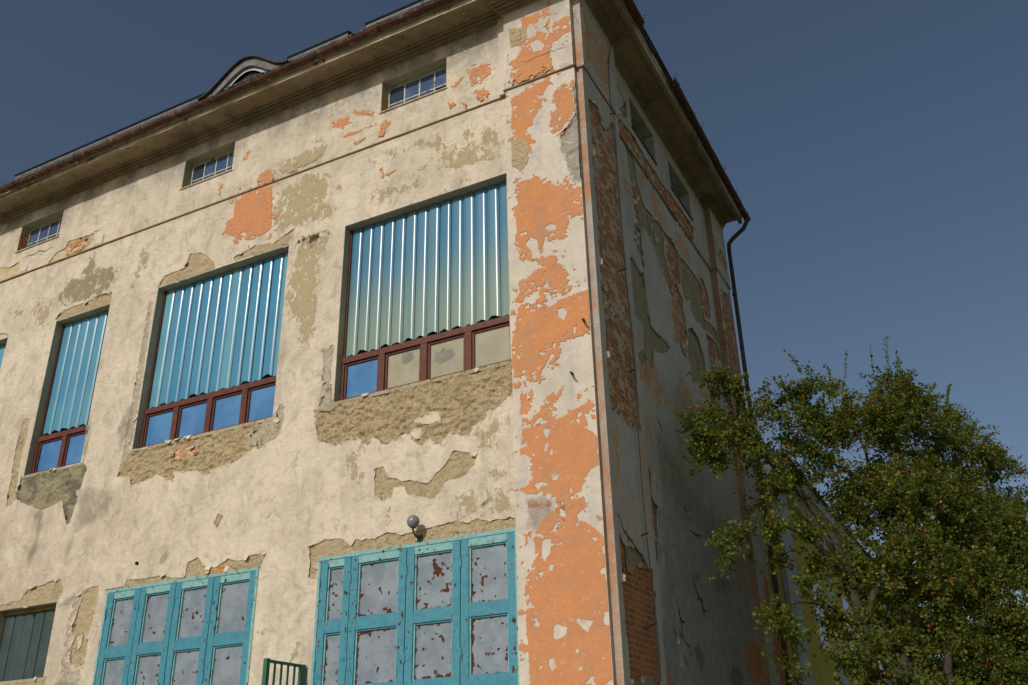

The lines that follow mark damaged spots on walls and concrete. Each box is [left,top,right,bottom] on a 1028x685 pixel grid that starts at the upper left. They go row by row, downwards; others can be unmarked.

peeling [218,169,295,260]
spalling [118,301,284,485]
peeling [308,0,743,685]
spalling [6,418,92,524]
corrosion [105,579,232,647]
corrosion [315,558,517,685]
corrosion [401,538,514,610]